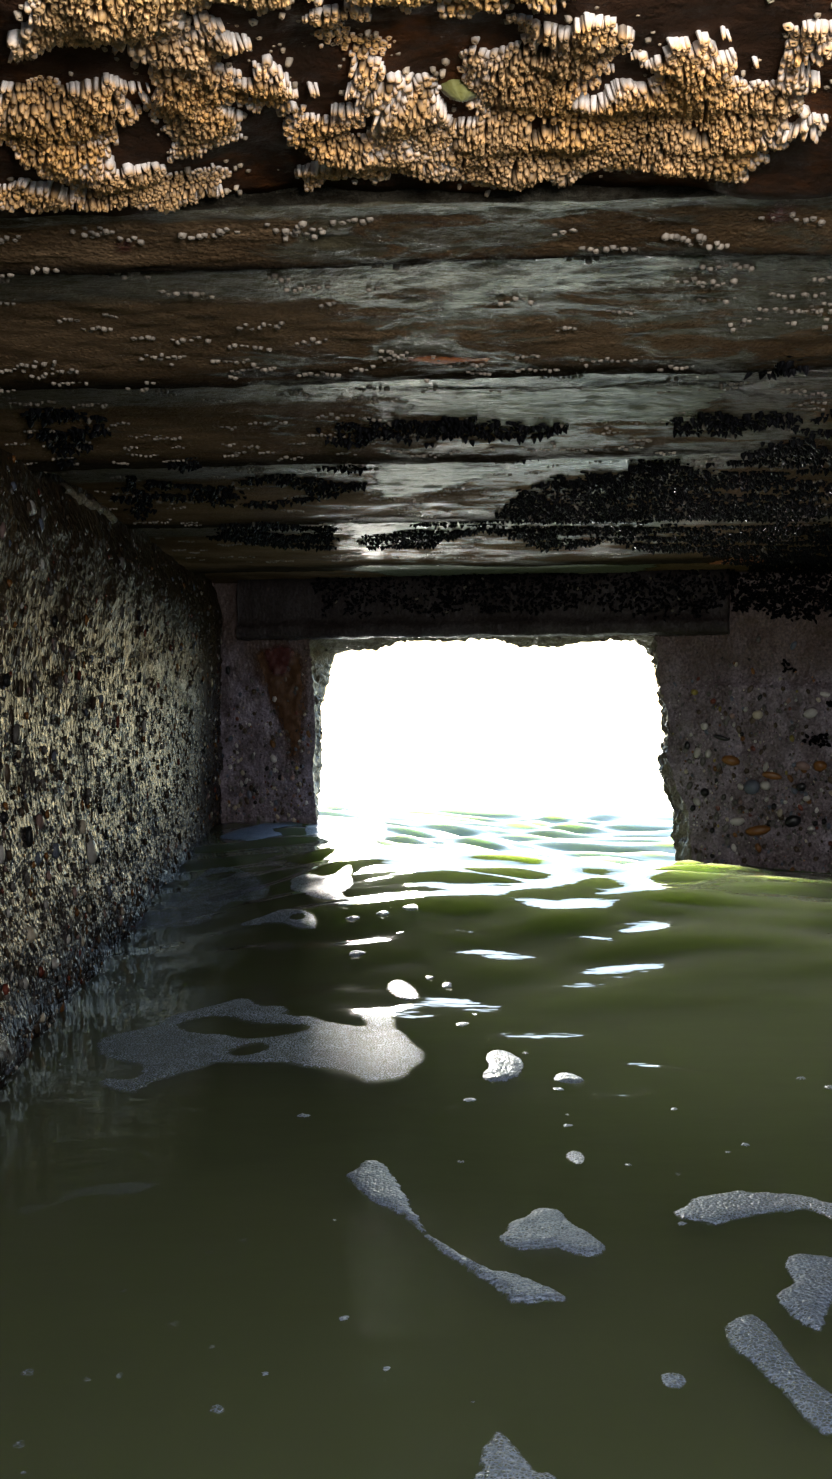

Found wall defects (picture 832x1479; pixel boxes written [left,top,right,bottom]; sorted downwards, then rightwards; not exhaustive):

rust [255,645,307,768]